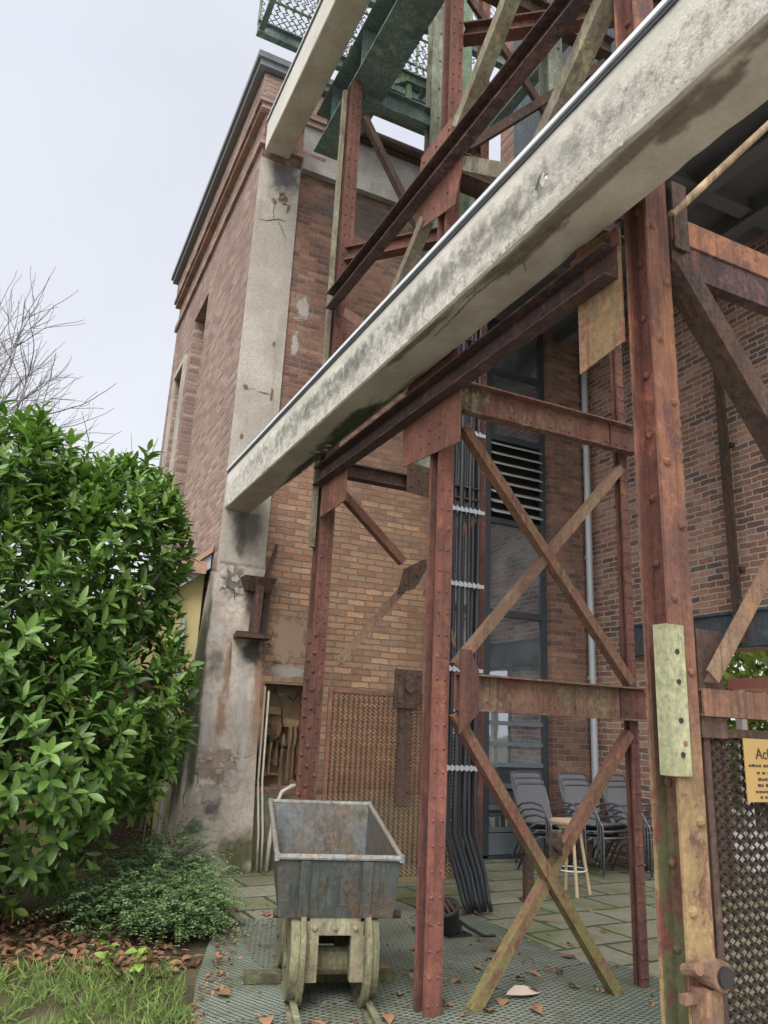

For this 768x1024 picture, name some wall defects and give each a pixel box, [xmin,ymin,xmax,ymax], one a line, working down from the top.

water stain [274,161,298,187]
water stain [480,61,748,284]
water stain [388,314,448,365]
water stain [237,515,257,551]